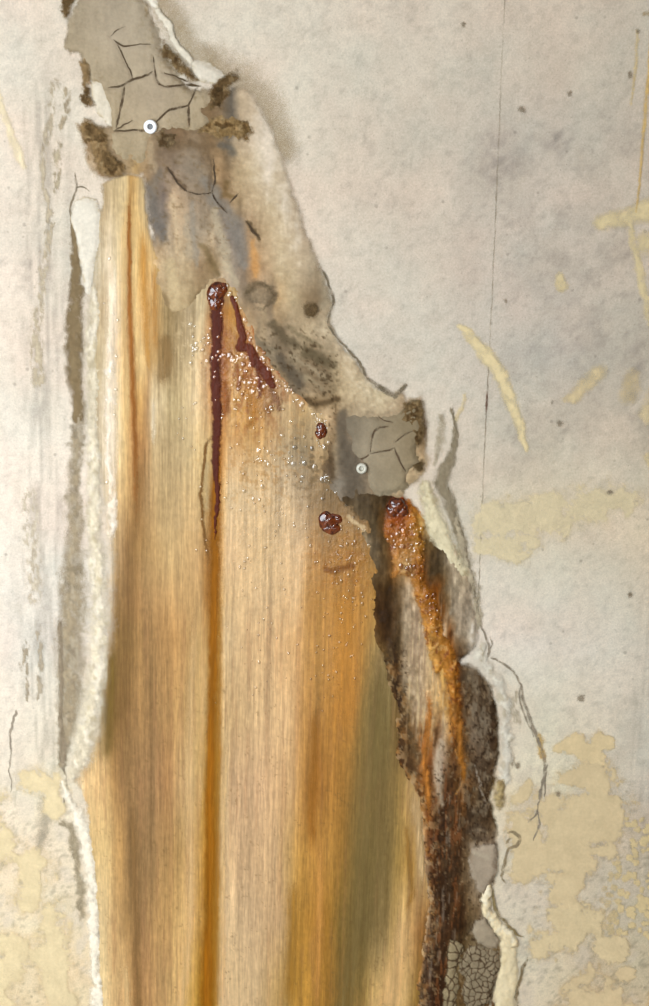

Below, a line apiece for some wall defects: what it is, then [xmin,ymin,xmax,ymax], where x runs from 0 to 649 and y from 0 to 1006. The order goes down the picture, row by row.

spalling [60,0,74,19]
spalling [79,59,126,179]
crack [109,28,203,132]
spalling [155,128,179,148]
spalling [147,0,254,142]
peeling [70,196,101,296]
crack [321,269,414,472]
spalling [400,400,428,472]
corrosion [74,174,467,1006]
crack [448,488,548,1006]
peeling [479,884,519,1006]